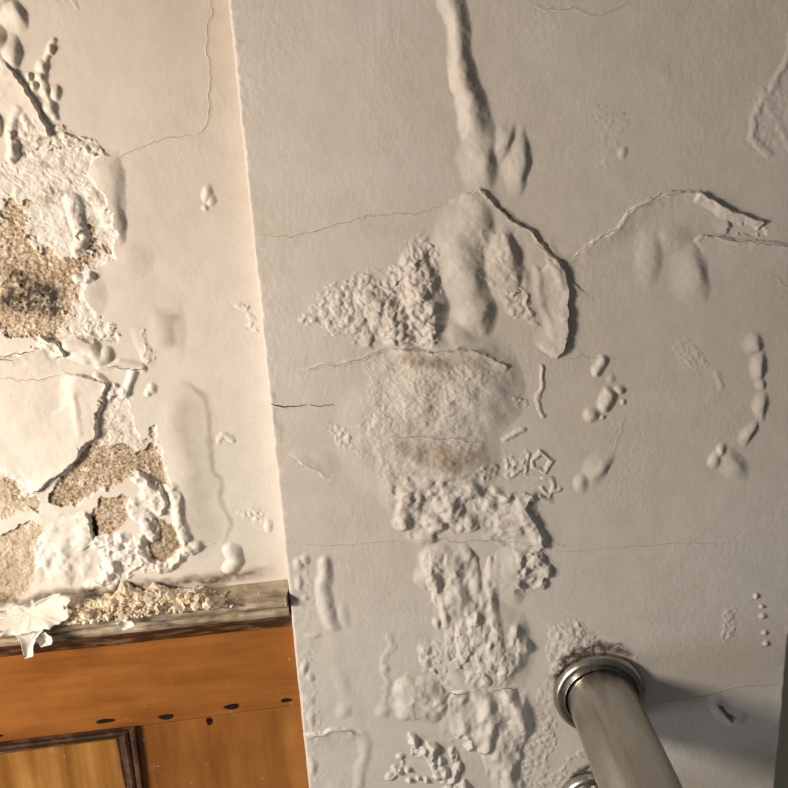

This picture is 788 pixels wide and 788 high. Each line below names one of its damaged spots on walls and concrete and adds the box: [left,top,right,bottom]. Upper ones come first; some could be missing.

crack [113,0,215,163]
crack [256,201,448,240]
crack [479,187,701,269]
crack [694,232,788,249]
crack [0,349,66,383]
flaking render [0,122,195,607]
crack [104,364,148,373]
peeling [524,551,555,592]
flaking render [116,619,135,630]
peeling [706,691,749,729]